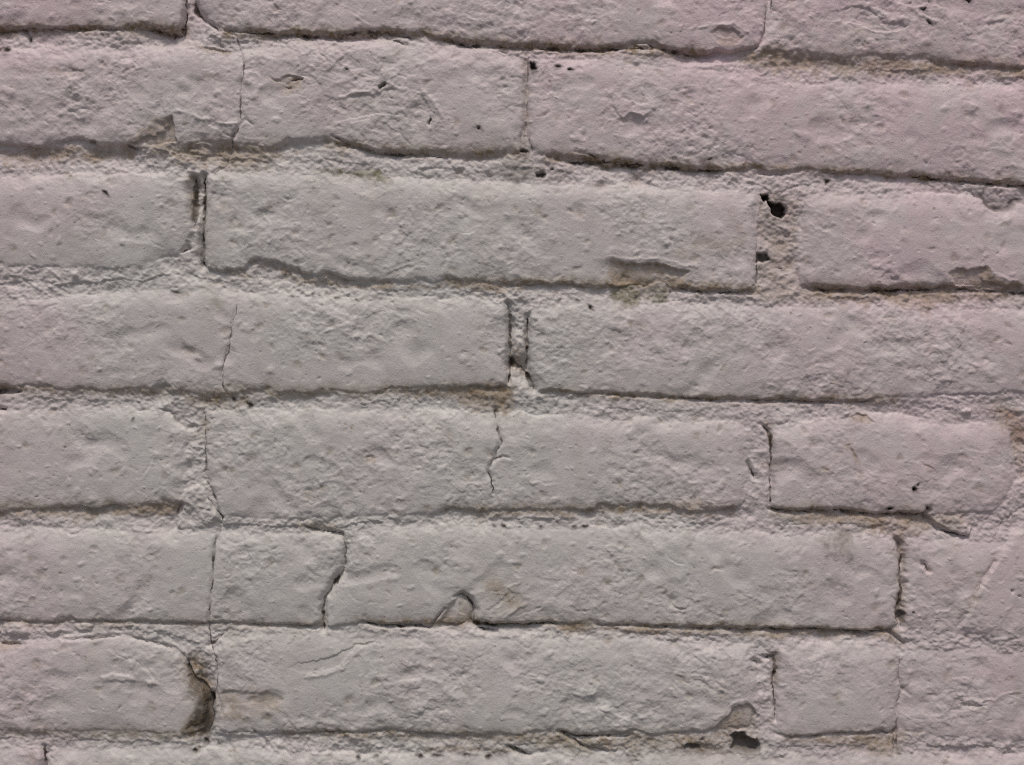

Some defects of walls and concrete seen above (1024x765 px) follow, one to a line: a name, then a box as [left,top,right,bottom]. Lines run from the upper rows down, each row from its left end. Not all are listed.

spalling [750,189,817,309]
crack [486,408,510,493]
crack [748,424,773,502]
crack [204,414,229,712]
spalling [175,653,287,745]
crack [305,525,347,630]
spalling [428,579,528,630]
crack [752,654,778,721]
crack [886,539,928,754]